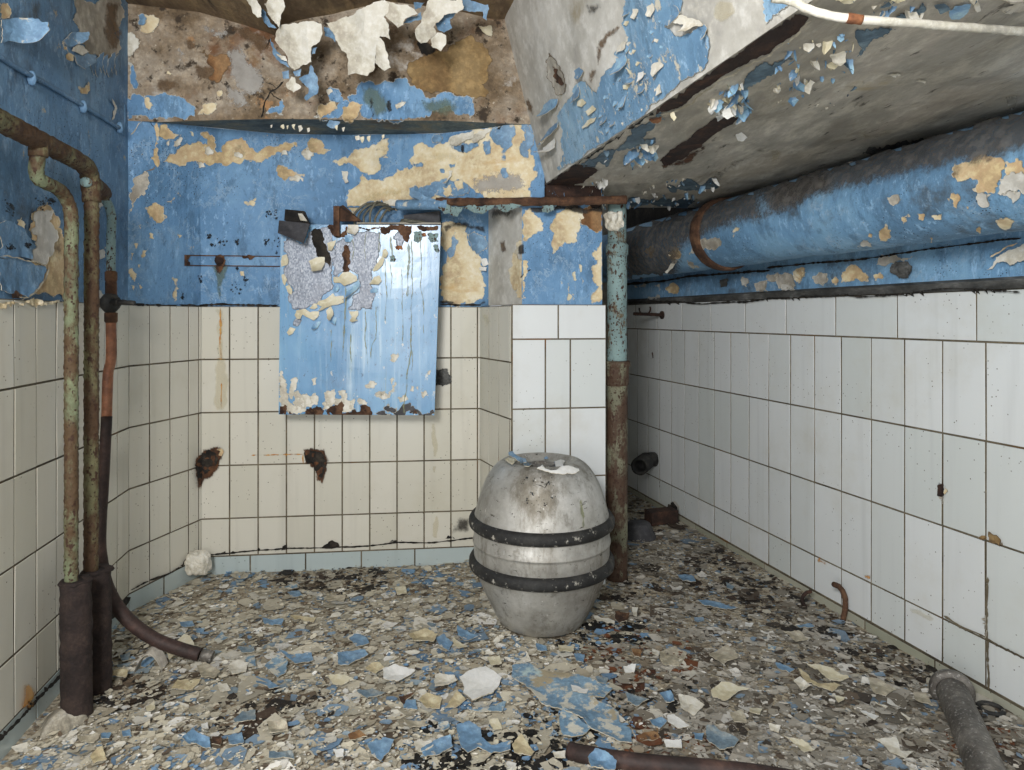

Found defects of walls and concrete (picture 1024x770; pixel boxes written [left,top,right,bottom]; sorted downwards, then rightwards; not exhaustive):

peeling [0,3,50,43]
peeling [998,0,1024,14]
flaking render [62,0,981,335]
peeling [948,156,1024,209]
peeling [996,217,1014,230]
peeling [0,202,64,309]
peeling [988,243,1024,270]
peeling [279,368,452,415]